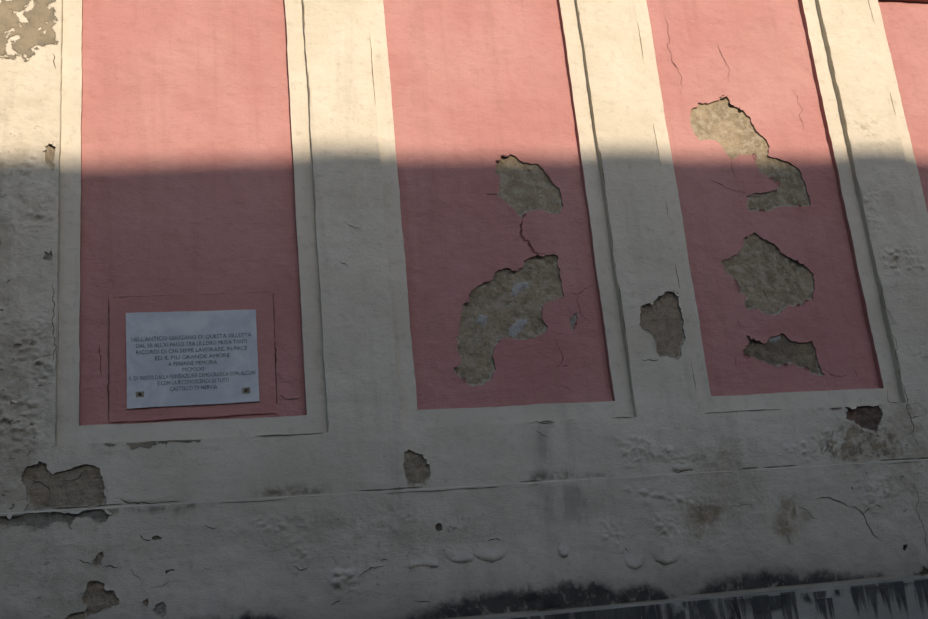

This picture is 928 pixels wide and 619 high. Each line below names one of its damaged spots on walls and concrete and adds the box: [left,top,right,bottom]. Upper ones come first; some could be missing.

flaking render [0,0,59,63]
spalling [495,153,563,218]
spalling [690,95,811,212]
crack [519,219,545,254]
spalling [720,233,815,316]
spalling [453,254,564,387]
spalling [639,291,686,361]
spalling [743,333,825,376]
spalling [823,405,898,461]
spalling [0,461,112,530]
crack [798,497,883,539]
water stain [410,566,928,619]